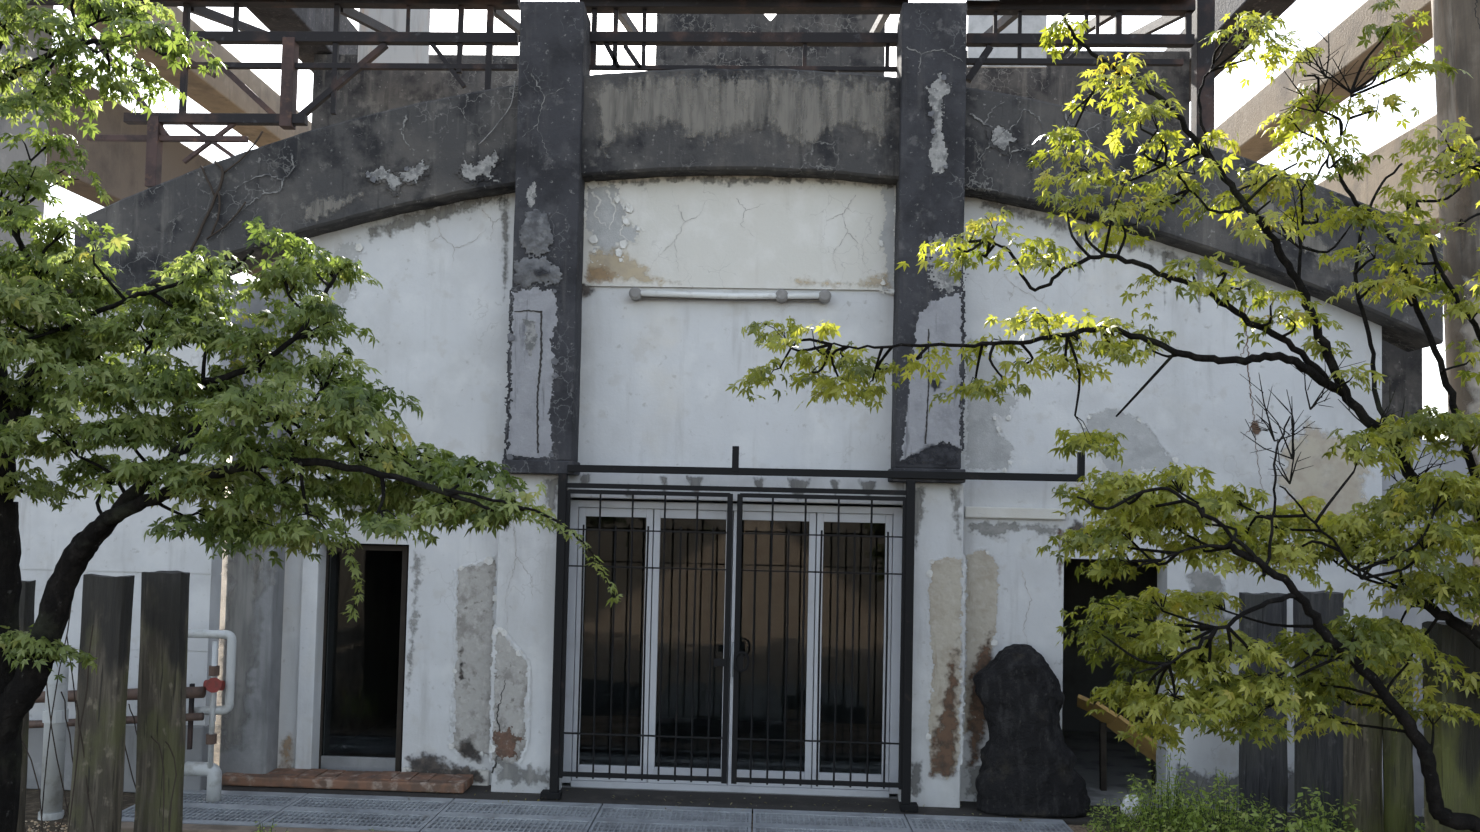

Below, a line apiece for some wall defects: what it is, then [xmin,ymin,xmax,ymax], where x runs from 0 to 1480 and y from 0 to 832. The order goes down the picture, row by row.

leakage [597,73,889,146]
peeling [923,69,960,178]
peeling [363,156,431,197]
peeling [455,146,502,185]
crack [660,198,760,268]
crack [831,195,864,270]
leakage [582,250,651,296]
peeling [896,229,1022,473]
spalling [447,553,533,773]
spalling [923,545,1003,785]